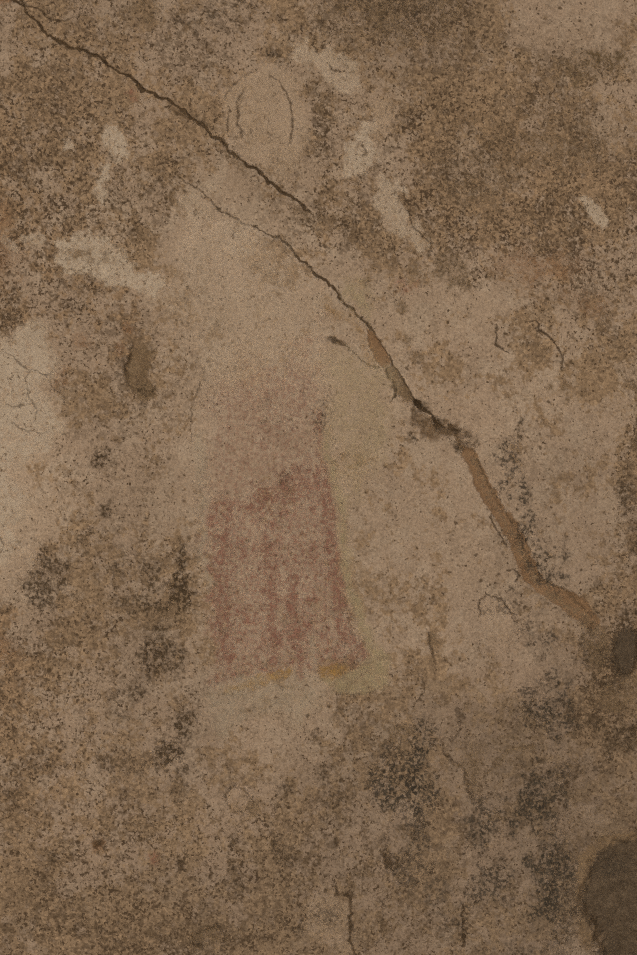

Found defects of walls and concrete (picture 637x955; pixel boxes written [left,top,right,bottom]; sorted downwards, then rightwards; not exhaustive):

crack [10,0,320,221]
leakage [560,48,635,89]
crack [190,184,600,629]